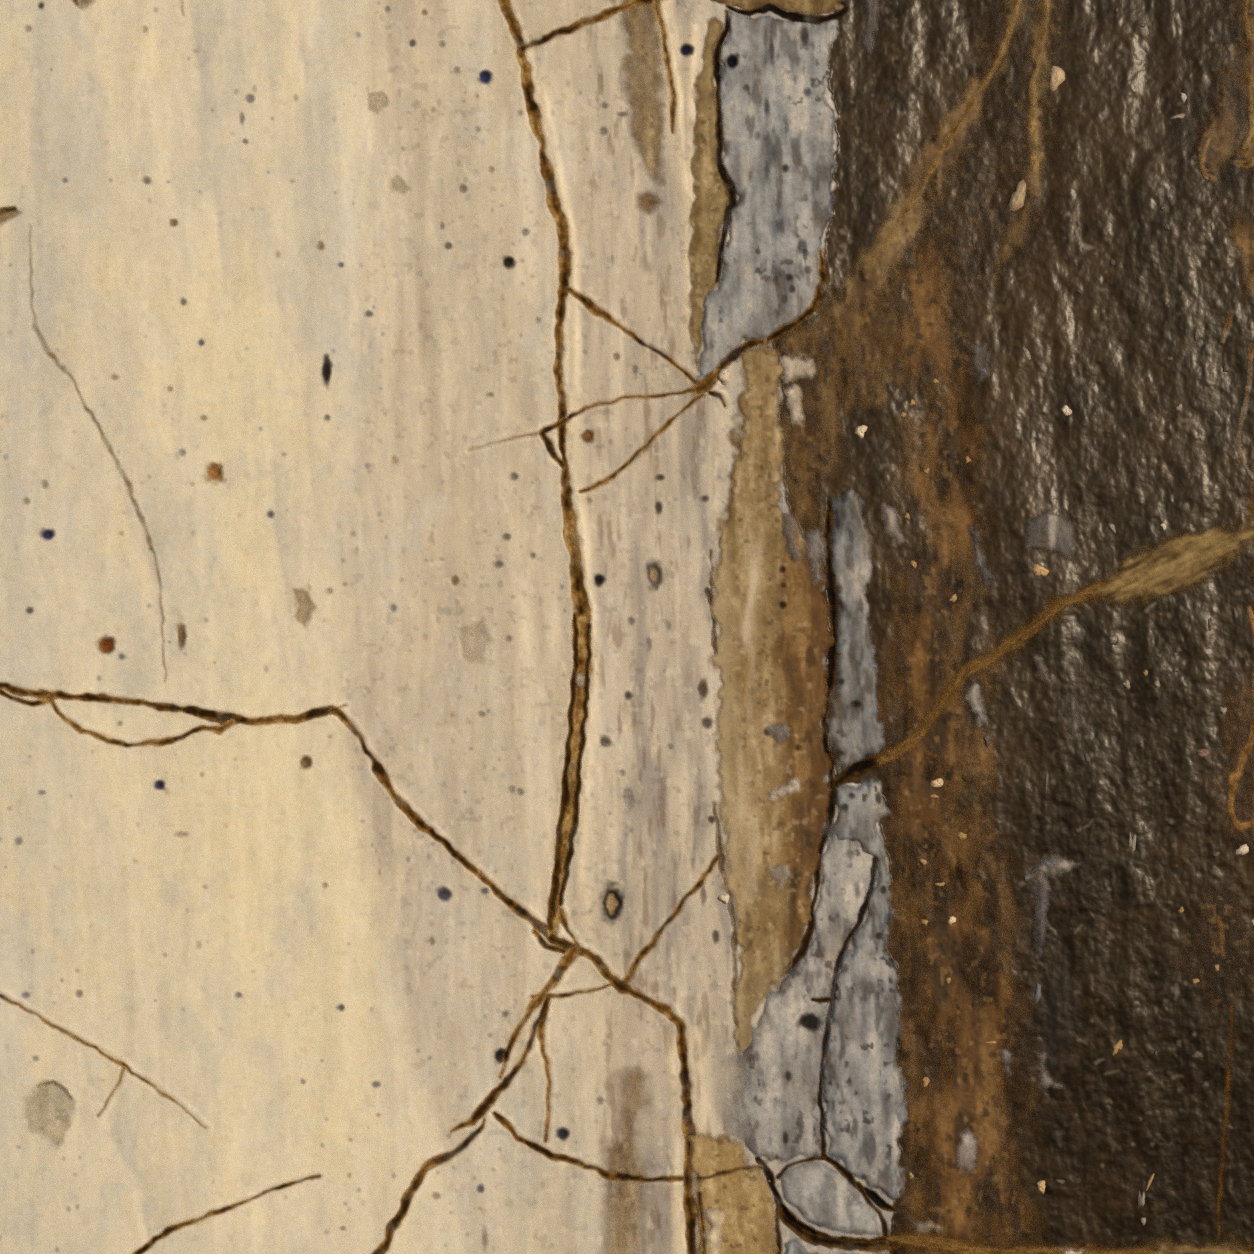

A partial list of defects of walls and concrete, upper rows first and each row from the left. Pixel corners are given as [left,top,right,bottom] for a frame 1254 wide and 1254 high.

crack [0,0,827,1254]
spalling [681,0,908,1254]
crack [827,311,1254,788]
crack [1228,689,1254,830]
crack [755,857,1254,1254]